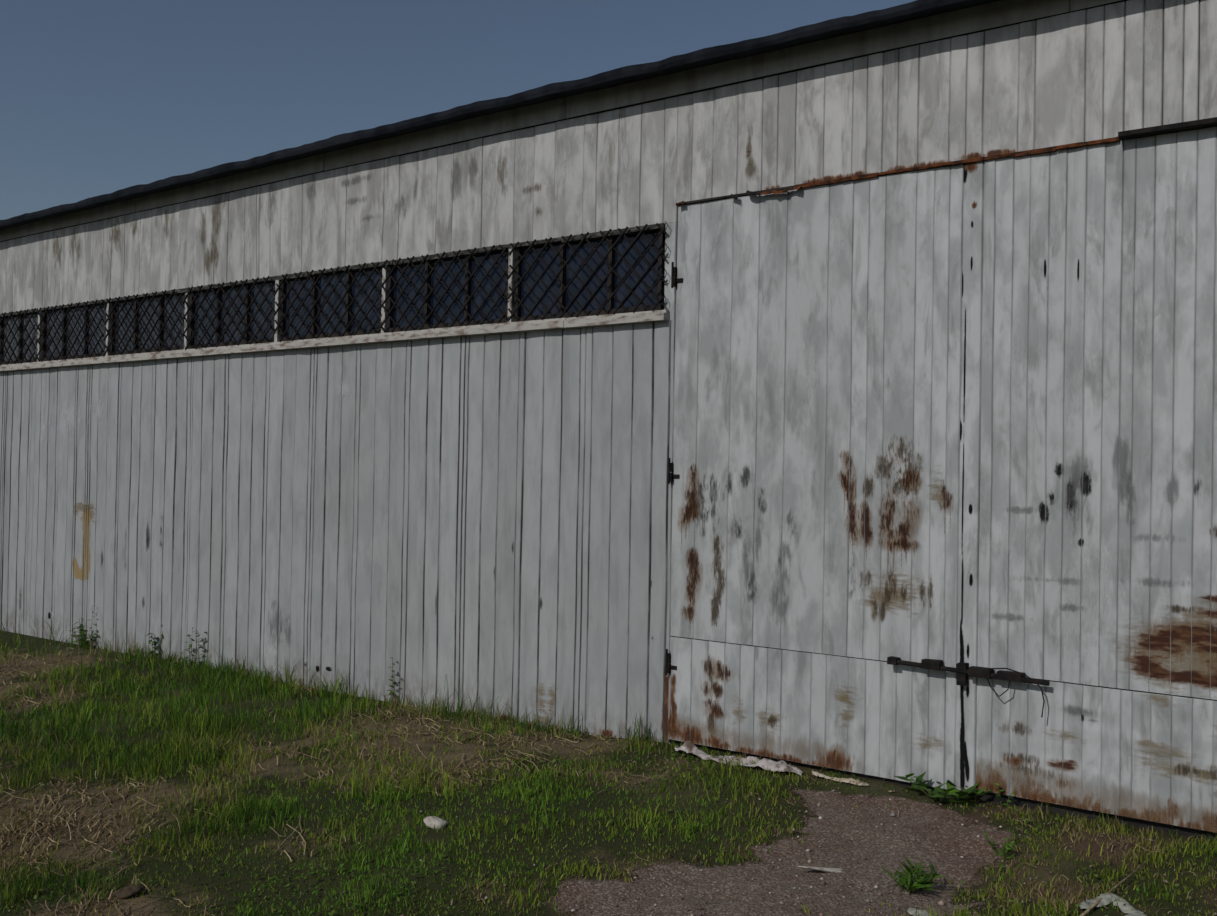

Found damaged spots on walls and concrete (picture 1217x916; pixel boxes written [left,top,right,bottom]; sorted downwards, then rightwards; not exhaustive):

rust [746,136,754,176]
rust [961,149,1015,172]
rust [681,466,717,619]
rust [840,438,933,621]
rust [1130,596,1217,687]
rust [661,658,852,772]